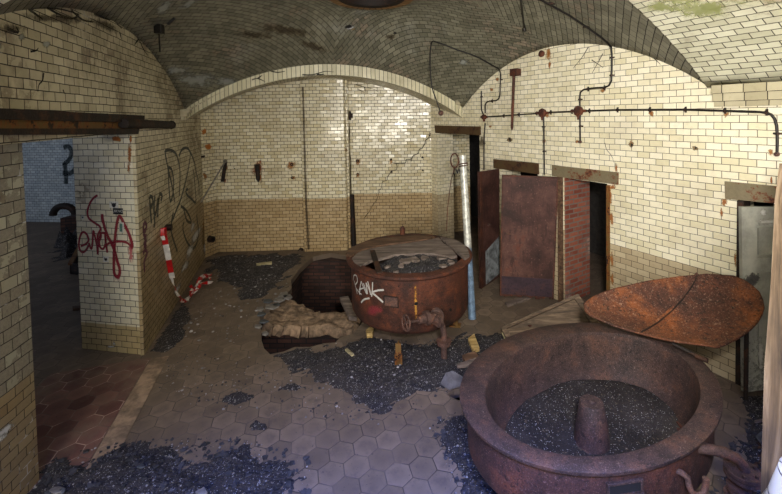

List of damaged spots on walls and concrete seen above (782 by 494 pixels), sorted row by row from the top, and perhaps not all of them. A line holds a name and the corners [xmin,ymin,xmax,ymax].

crack [364,133,431,218]
spalling [172,254,352,344]
spalling [261,324,338,354]